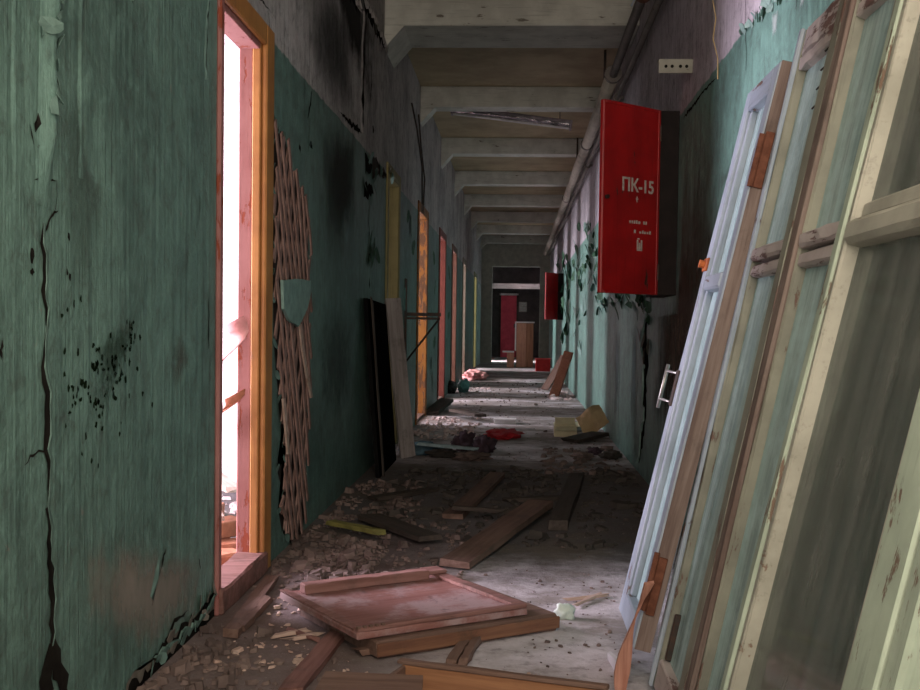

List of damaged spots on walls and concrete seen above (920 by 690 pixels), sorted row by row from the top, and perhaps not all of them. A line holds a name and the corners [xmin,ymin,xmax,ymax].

crack [203,0,211,80]
water stain [315,0,374,86]
crack [339,11,374,133]
crack [684,79,715,117]
peeling [739,0,779,35]
crack [25,178,69,690]
water stain [63,320,141,431]
flaking render [273,115,313,543]
crack [636,312,649,462]
flaking render [126,582,218,690]